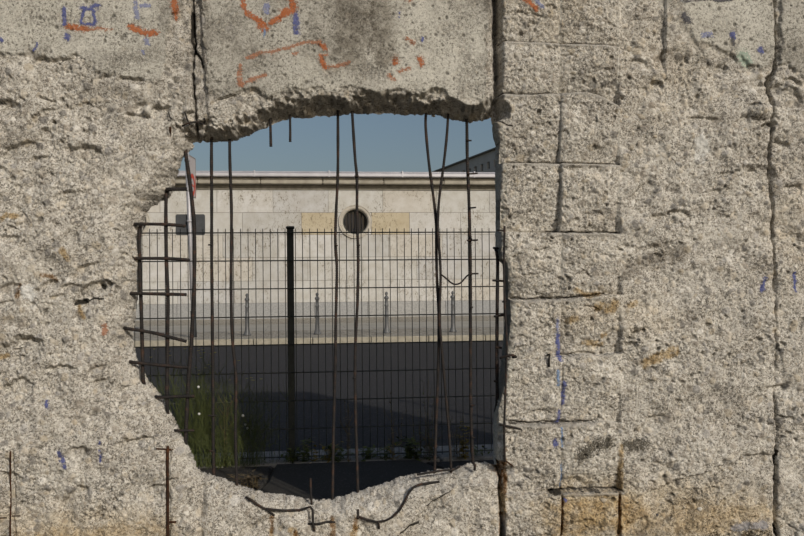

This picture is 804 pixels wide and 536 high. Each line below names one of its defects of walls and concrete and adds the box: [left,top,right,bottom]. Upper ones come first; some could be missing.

crack [191,11,204,69]
spalling [0,0,562,536]
spalling [194,0,804,536]